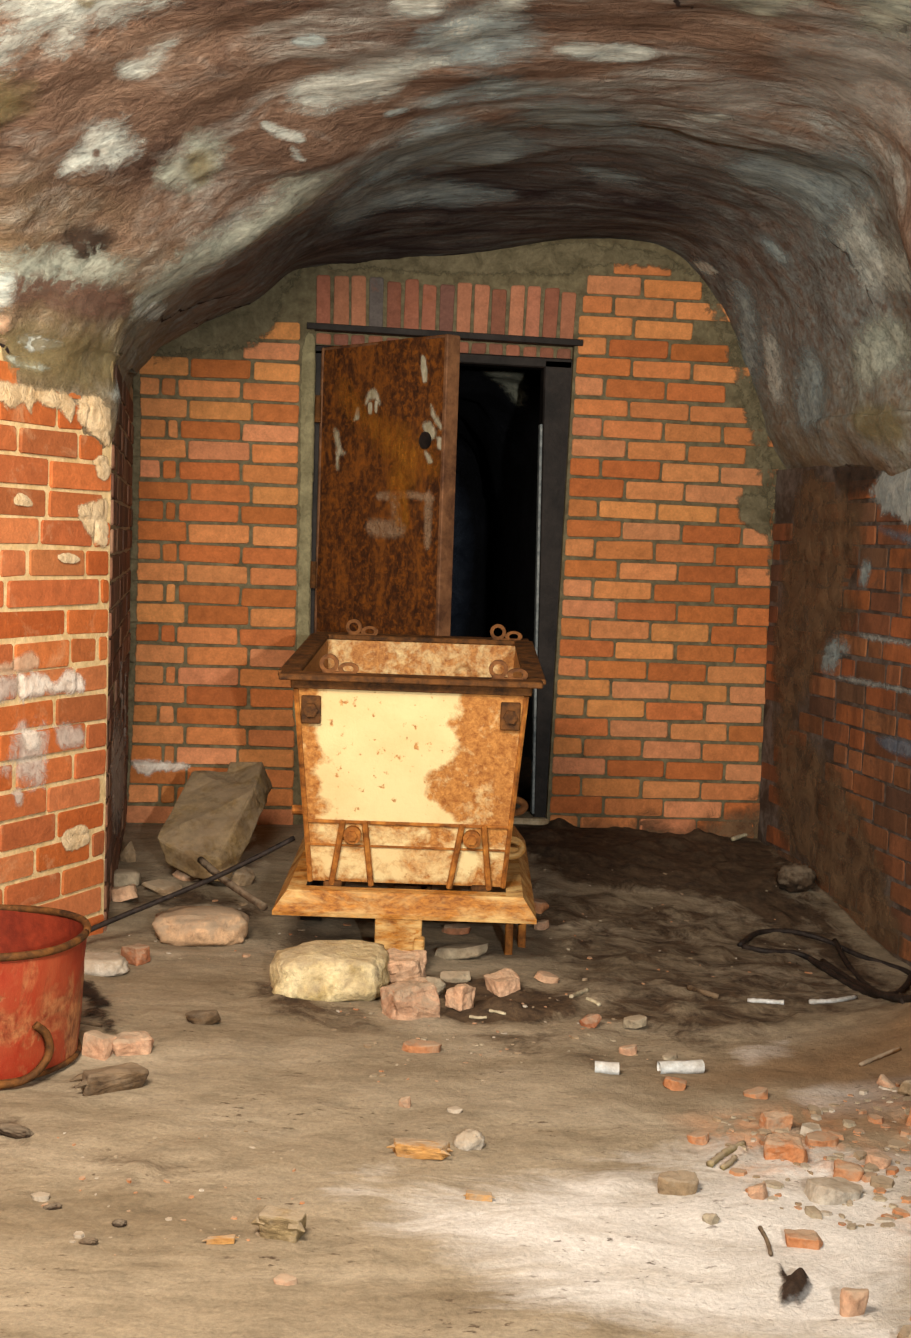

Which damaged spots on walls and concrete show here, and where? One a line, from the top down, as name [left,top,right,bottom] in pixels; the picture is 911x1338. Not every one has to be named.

leakage [556,43,653,62]
crack [878,22,911,53]
leakage [480,80,637,135]
leakage [261,122,304,160]
leakage [578,167,639,181]
leakage [762,239,787,263]
leakage [15,277,129,318]
leakage [2,333,113,381]
leakage [729,283,782,405]
leakage [0,670,85,702]
leakage [7,722,47,803]